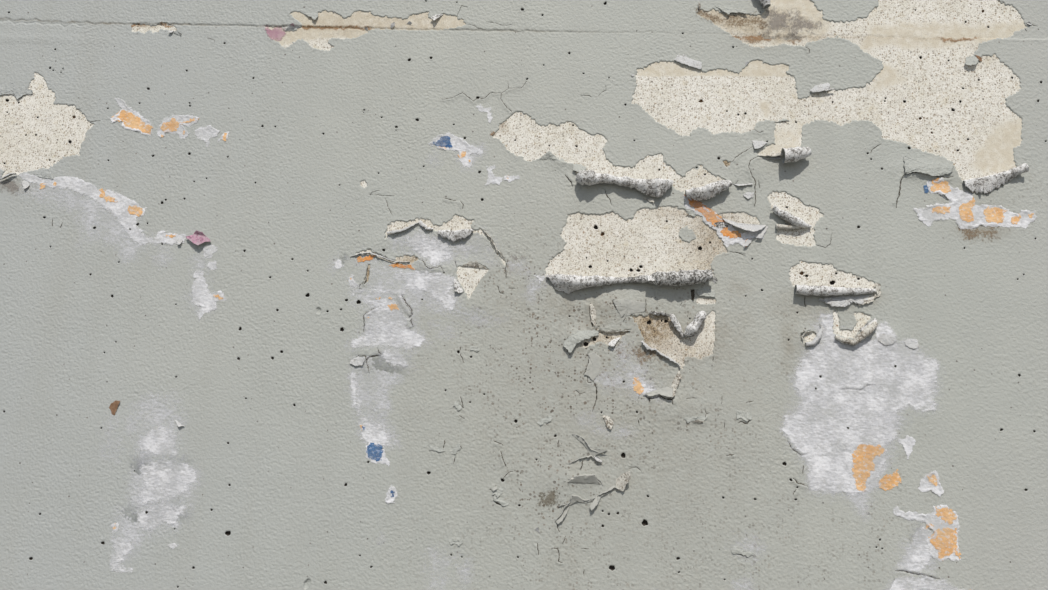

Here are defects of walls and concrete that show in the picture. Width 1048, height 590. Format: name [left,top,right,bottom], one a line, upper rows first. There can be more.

peeling [265,10,466,51]
peeling [632,0,1032,195]
peeling [0,72,94,189]
peeling [350,249,418,285]
peeling [385,215,506,265]
peeling [453,261,489,298]
peeling [492,112,760,398]
peeling [768,191,823,247]
peeling [789,261,919,349]
peeling [350,357,365,366]